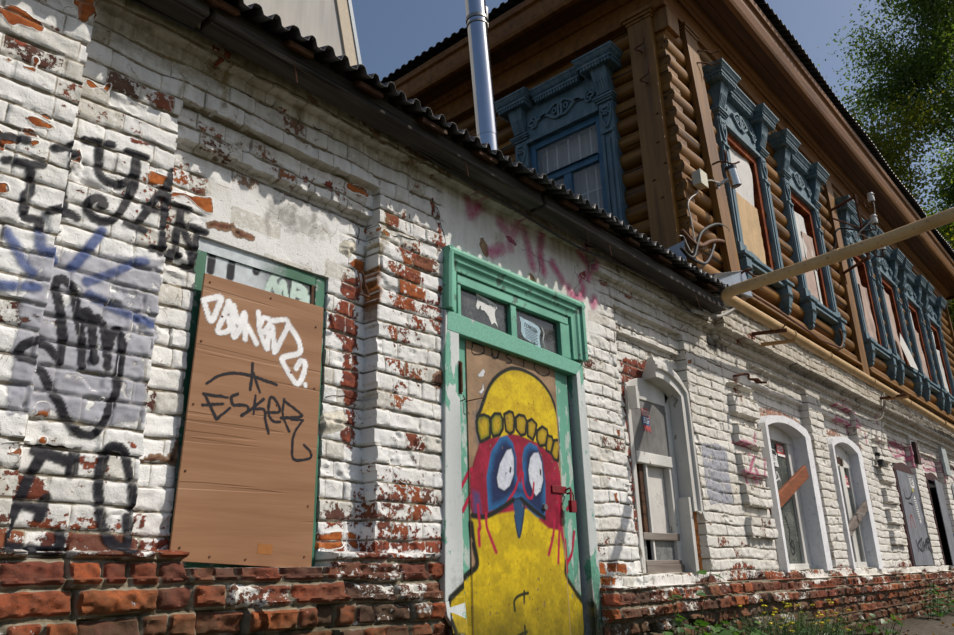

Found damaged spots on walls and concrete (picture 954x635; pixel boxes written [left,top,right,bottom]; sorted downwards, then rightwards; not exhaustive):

peeling [0,4,60,34]
peeling [3,56,41,73]
peeling [0,112,56,153]
peeling [0,182,11,195]
peeling [146,170,255,241]
peeling [430,198,446,251]
peeling [420,286,443,340]
peeling [327,258,365,449]
spalling [431,370,443,389]
peeling [616,357,647,536]
peeling [315,466,442,566]
peeling [131,539,170,550]